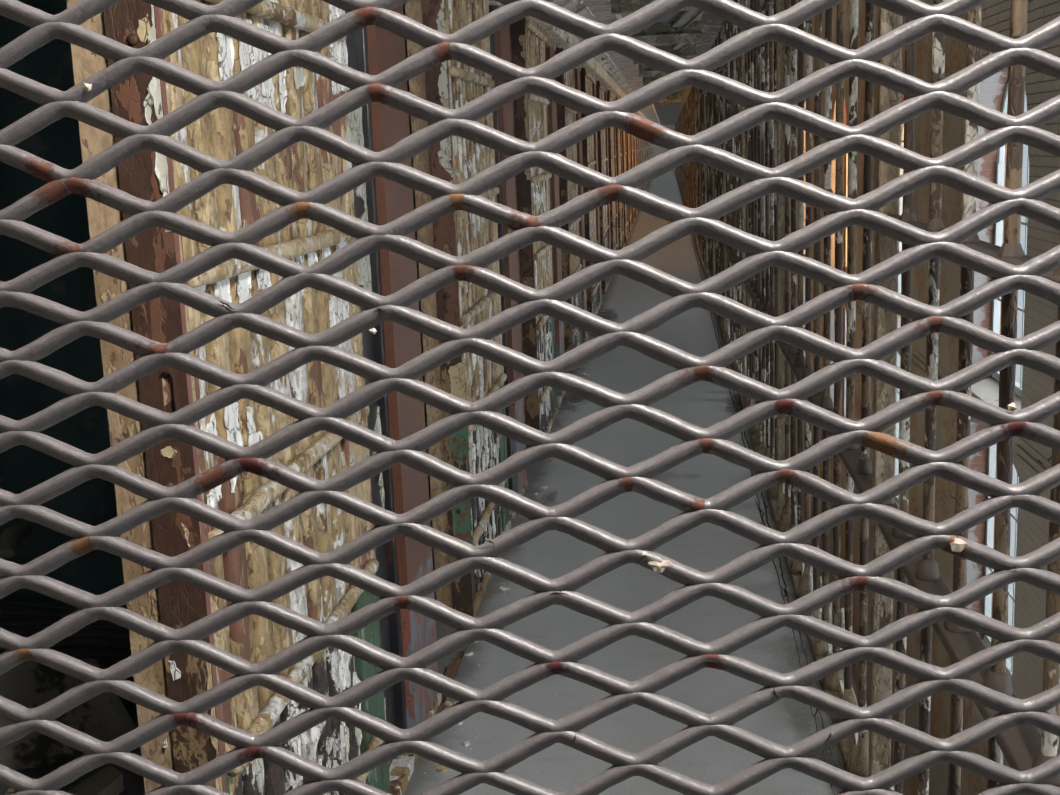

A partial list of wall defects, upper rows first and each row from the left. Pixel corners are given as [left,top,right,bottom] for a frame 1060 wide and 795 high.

peeling [329,4,345,22]
peeling [217,33,271,81]
peeling [330,40,348,66]
peeling [245,67,307,114]
peeling [332,81,349,95]
rust [625,115,663,145]
rust [25,157,101,205]
peeling [206,402,263,446]
rust [862,431,912,460]
rust [194,457,282,492]
peeling [293,721,362,768]
peeling [255,758,263,793]